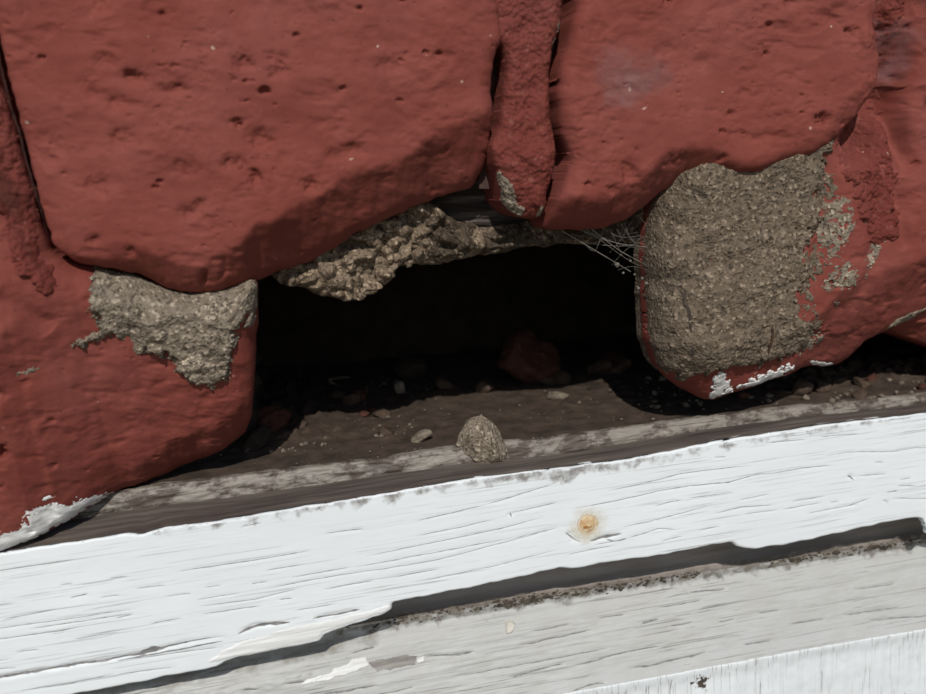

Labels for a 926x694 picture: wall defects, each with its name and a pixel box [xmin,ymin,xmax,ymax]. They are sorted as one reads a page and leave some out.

crack [489,60,497,107]
crack [478,167,490,189]
spalling [271,139,887,382]
spalling [71,265,258,390]
peeling [503,392,926,459]
peeling [69,445,475,521]
peeling [208,605,392,663]
peeling [301,654,425,685]